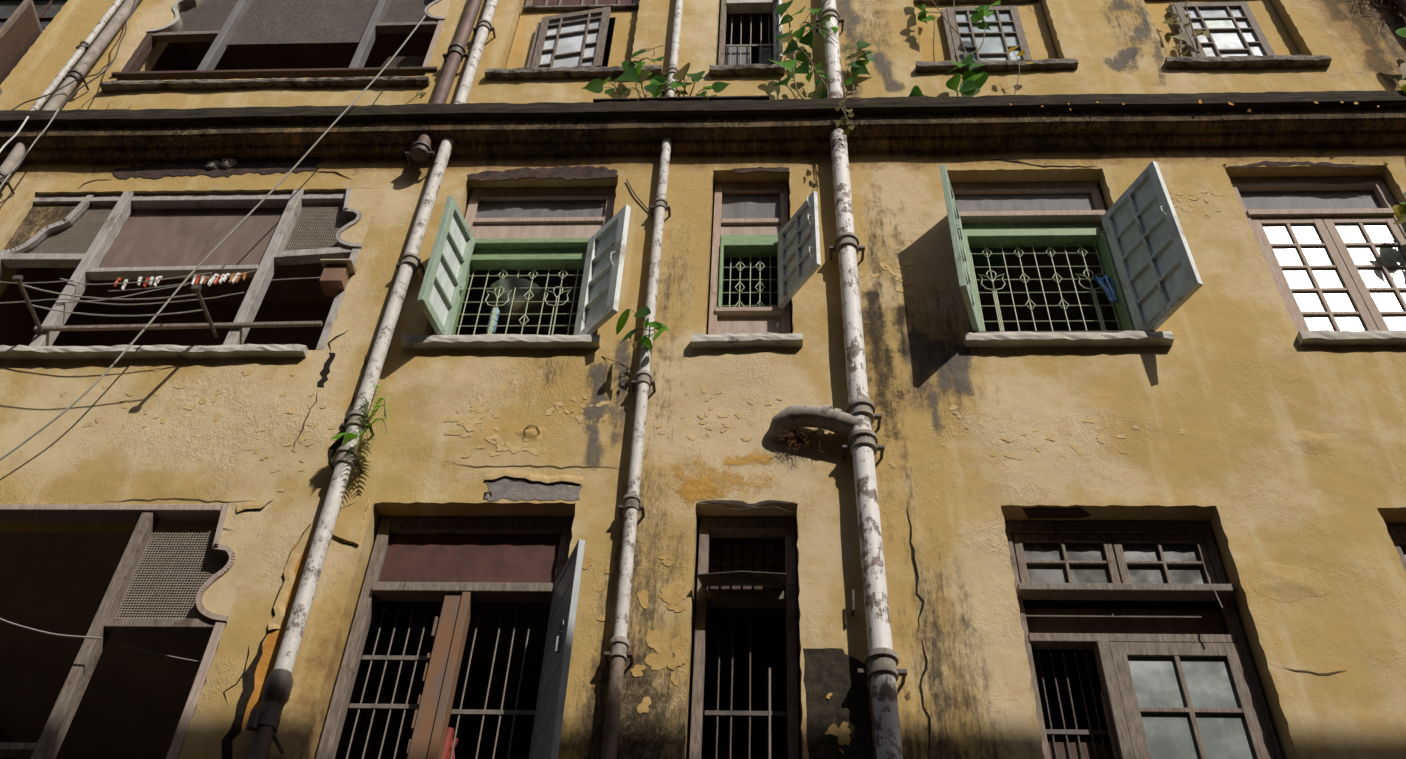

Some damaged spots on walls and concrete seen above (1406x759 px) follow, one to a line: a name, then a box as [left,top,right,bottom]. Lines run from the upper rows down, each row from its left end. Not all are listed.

water stain [1105,0,1164,79]
crack [293,330,367,453]
peeling [444,402,539,458]
peeling [546,385,611,423]
water stain [862,290,973,438]
spalling [483,479,583,502]
crack [907,503,931,759]
peeling [824,721,851,754]